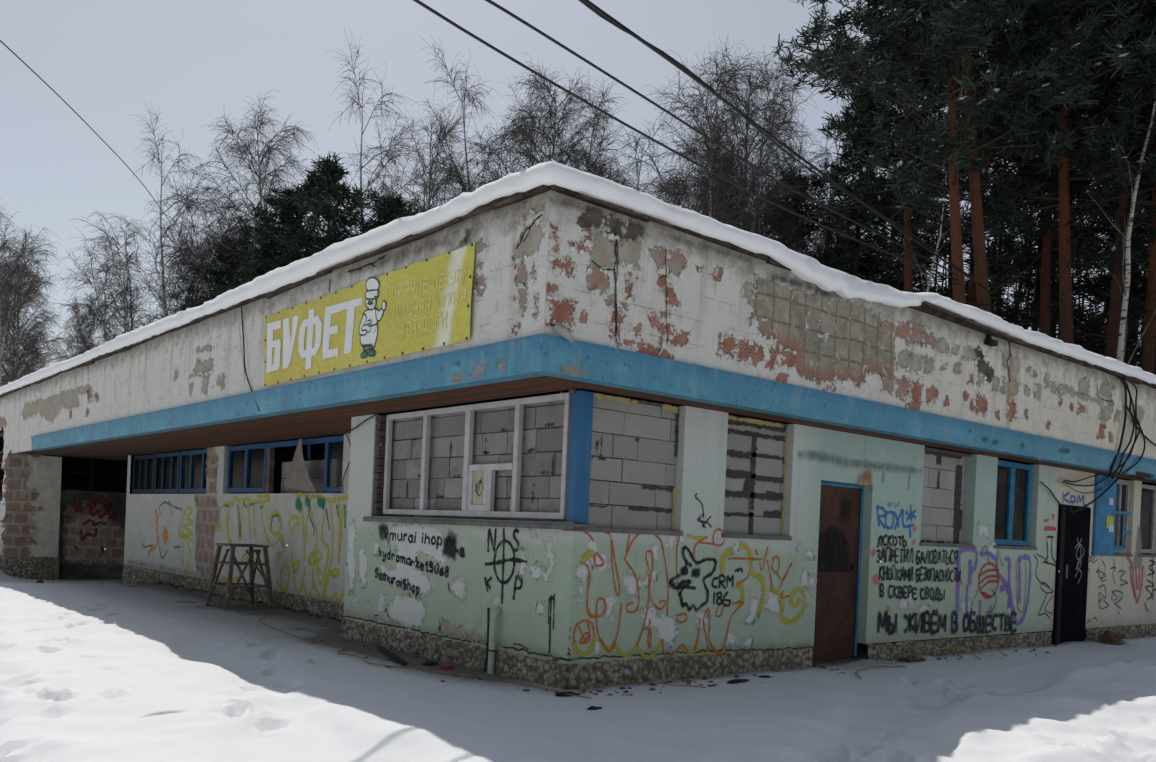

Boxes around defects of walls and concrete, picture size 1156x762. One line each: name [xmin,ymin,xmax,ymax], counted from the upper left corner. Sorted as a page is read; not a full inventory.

crack [592,233,619,344]
spalling [509,193,724,360]
peeling [21,384,99,423]
peeling [173,343,226,398]
spalling [716,274,1145,443]
spalling [0,417,44,558]
spalling [194,447,221,577]
peeling [346,516,487,648]
peeling [517,528,556,587]